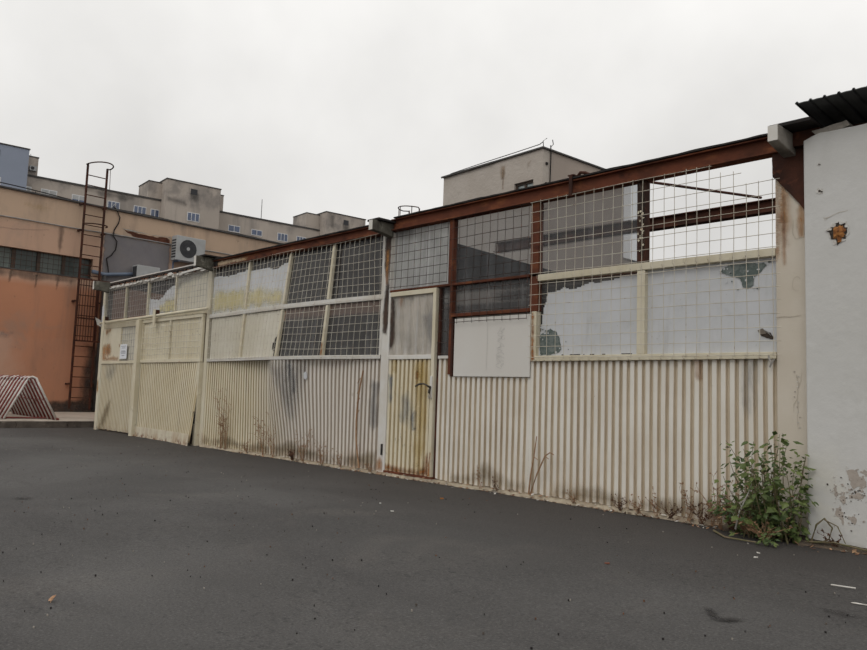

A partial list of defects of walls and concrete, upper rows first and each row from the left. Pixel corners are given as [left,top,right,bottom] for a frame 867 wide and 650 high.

rust [779,189,805,239]
spalling [826,222,848,245]
peeling [827,466,867,532]